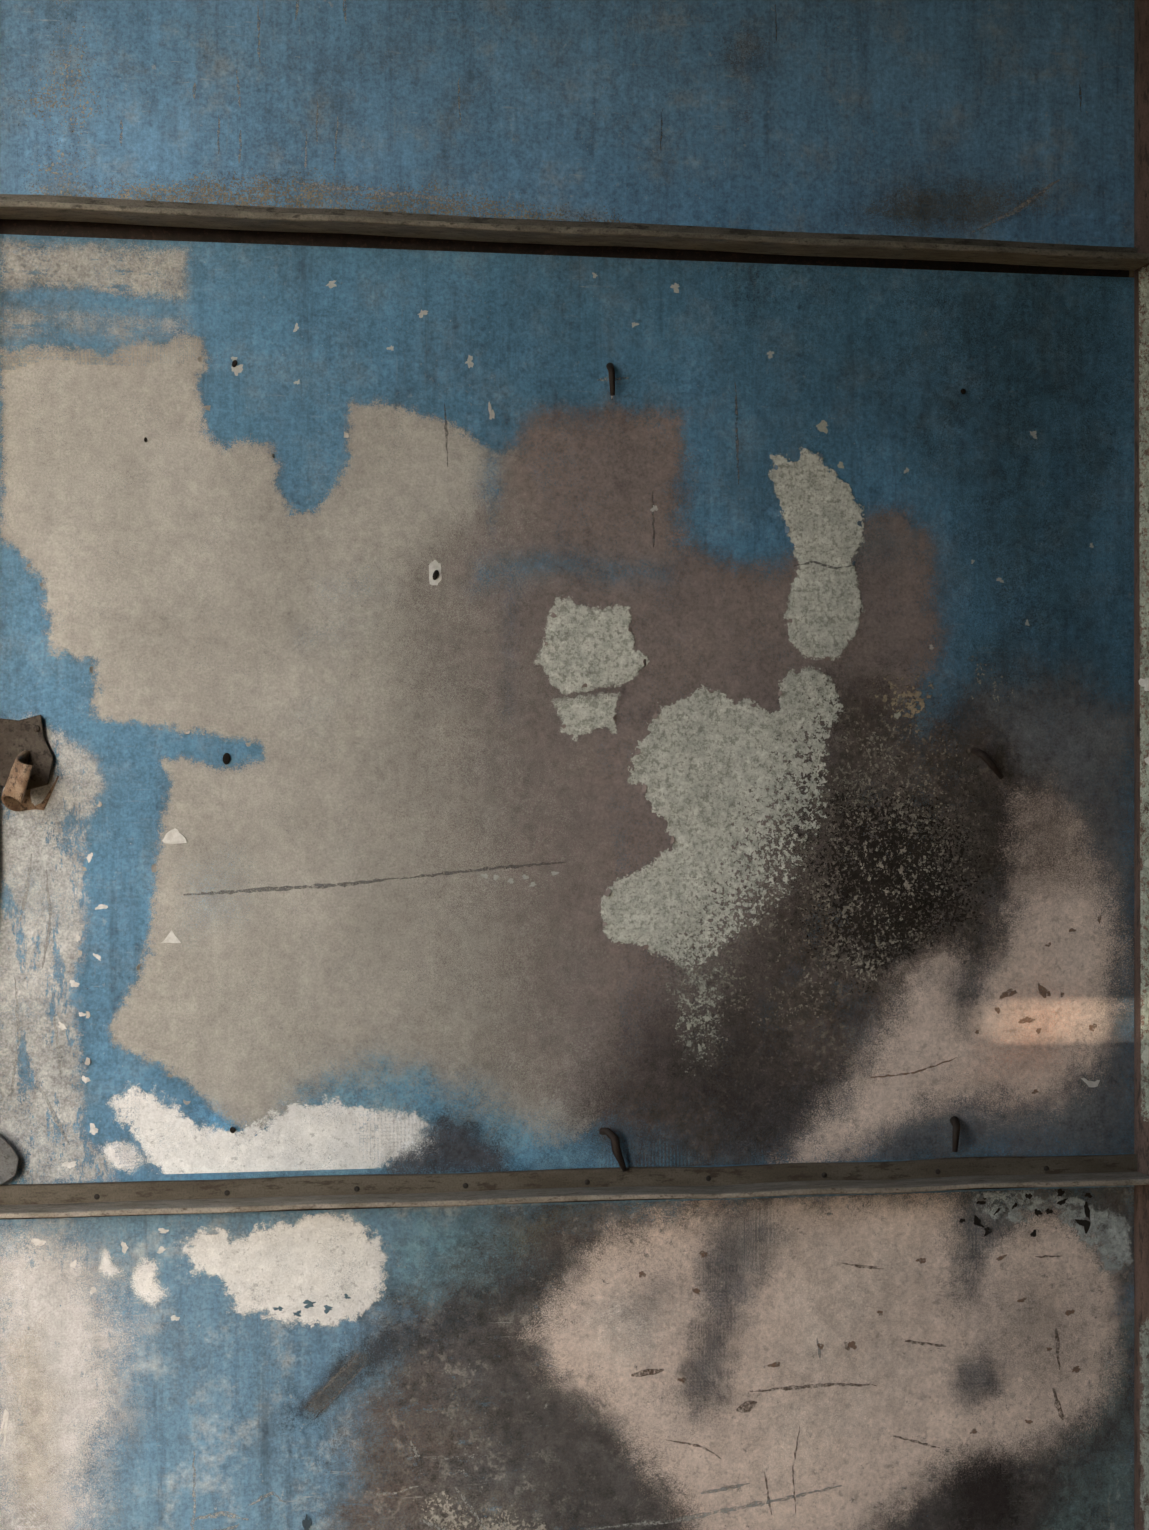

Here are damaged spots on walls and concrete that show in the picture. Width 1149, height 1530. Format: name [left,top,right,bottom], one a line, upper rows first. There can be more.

peeling [231,357,243,376]
peeling [816,420,829,434]
peeling [429,560,442,585]
peeling [534,596,650,741]
peeling [600,447,993,1076]
peeling [162,829,187,844]
peeling [161,930,181,943]